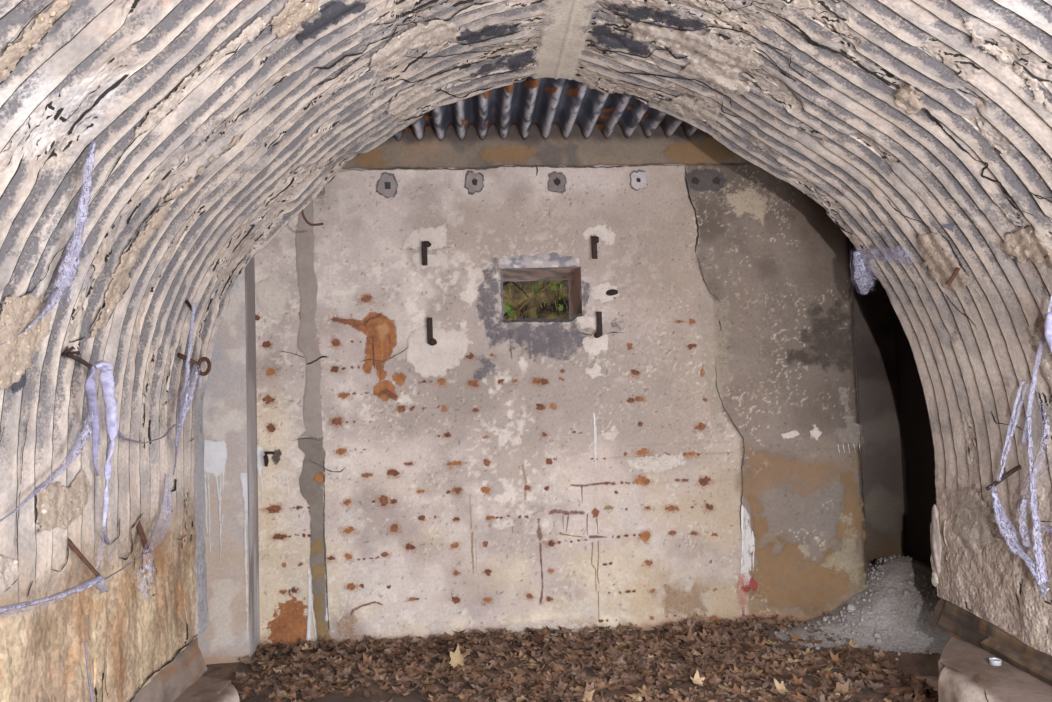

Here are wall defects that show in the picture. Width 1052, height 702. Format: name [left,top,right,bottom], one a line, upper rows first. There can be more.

crack [91,21,271,200]
spalling [369,20,459,71]
spalling [628,23,765,129]
crack [588,3,900,117]
crack [923,108,1052,216]
corrosion [316,290,451,415]
spalling [500,266,620,379]
leakage [204,439,227,565]
leakage [240,446,265,640]
corrosion [258,393,280,435]
leakage [733,298,869,624]
corrosion [265,587,318,649]